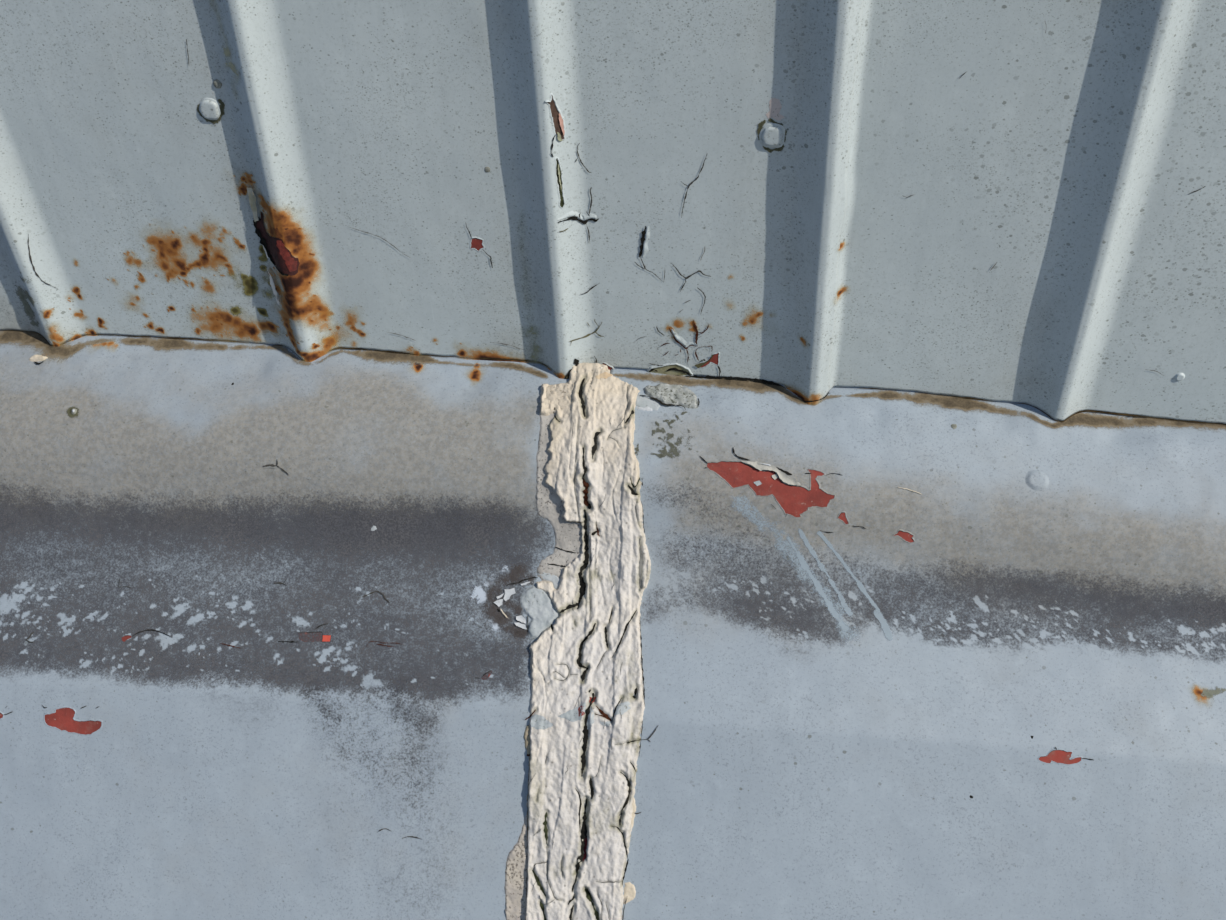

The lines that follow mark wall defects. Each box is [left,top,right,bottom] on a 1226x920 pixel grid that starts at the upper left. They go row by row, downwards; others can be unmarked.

crack [557,143,599,240]
crack [681,155,707,218]
corrosion [123,172,366,362]
crack [569,284,604,346]
crack [635,226,712,362]
peeling [700,448,866,533]
water stain [0,485,552,764]
crack [525,378,658,920]
water stain [645,529,1226,661]
peeling [42,705,103,736]
peeling [1037,747,1093,766]